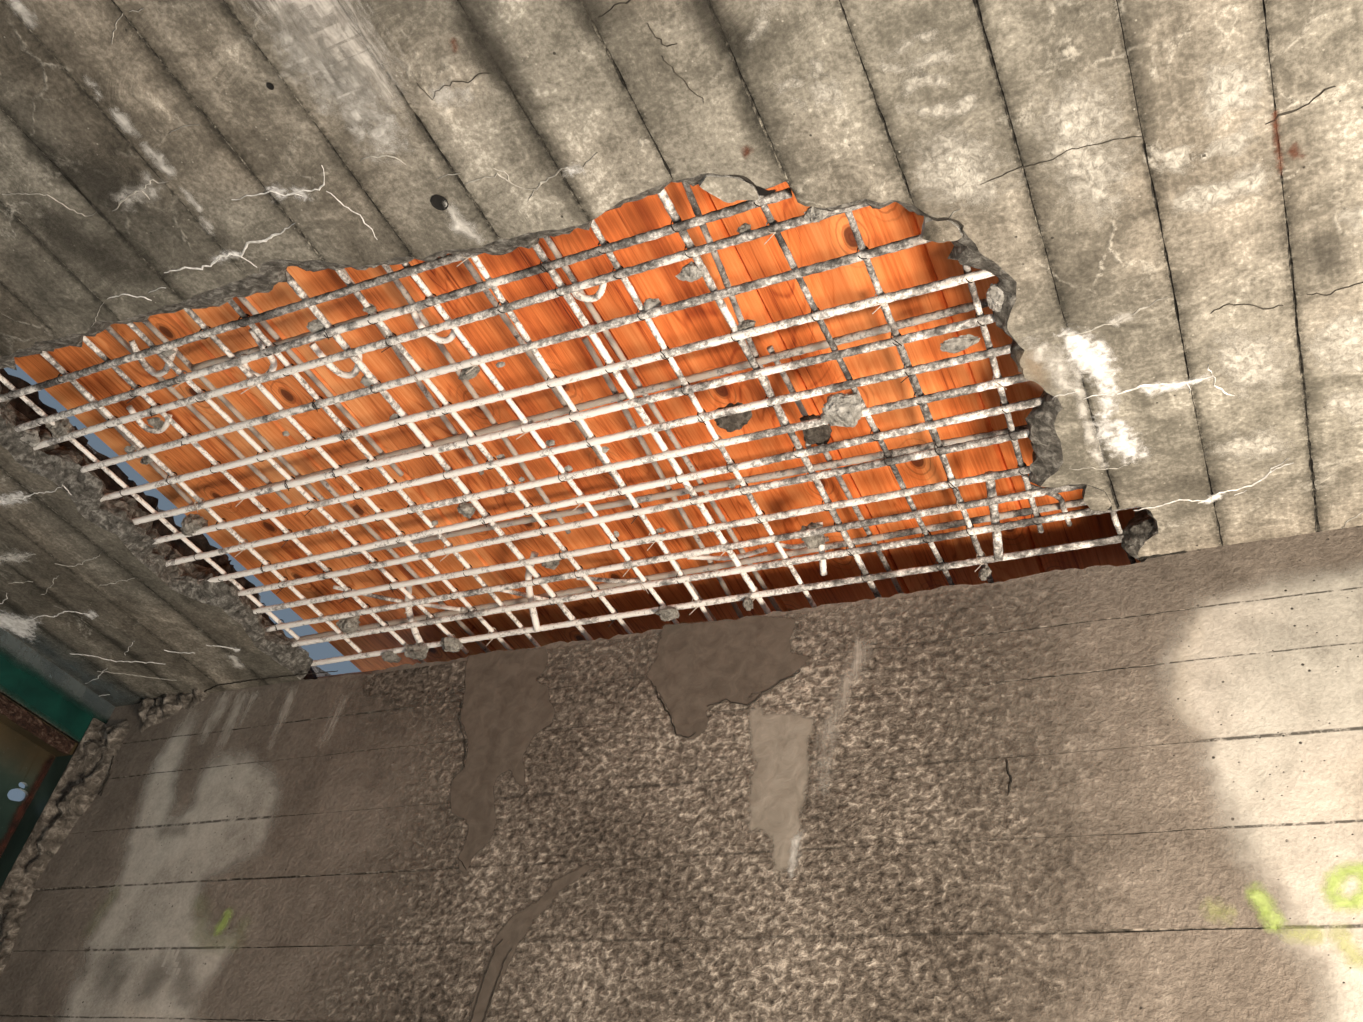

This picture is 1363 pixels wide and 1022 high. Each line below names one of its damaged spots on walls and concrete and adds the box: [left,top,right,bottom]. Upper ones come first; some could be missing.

peeling [920,133,995,203]
crack [91,165,378,327]
water stain [1029,331,1147,466]
crack [1052,365,1235,400]
crack [0,485,72,504]
crack [1134,458,1293,511]
crack [0,553,134,640]
spalling [0,173,1158,1022]
crack [73,641,337,696]